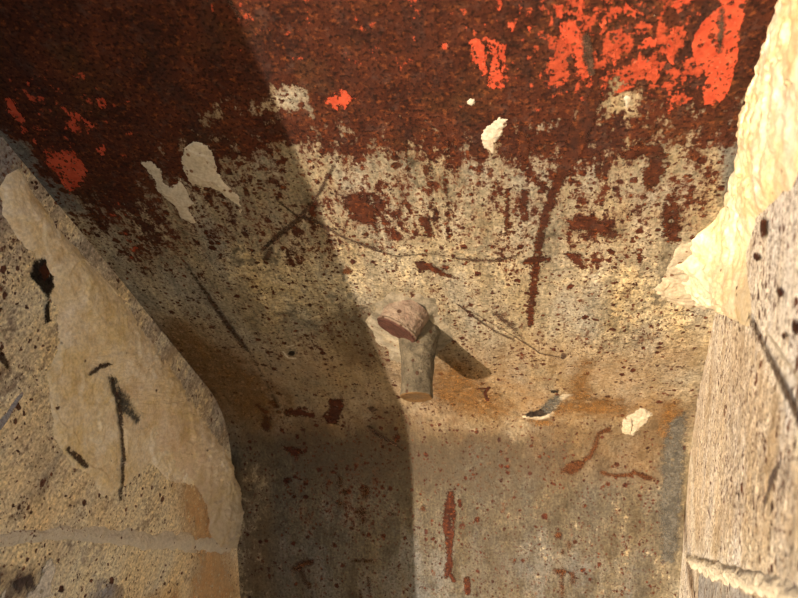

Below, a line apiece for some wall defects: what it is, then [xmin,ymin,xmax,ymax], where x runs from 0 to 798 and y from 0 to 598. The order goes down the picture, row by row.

rust [620,126,670,188]
rust [341,190,379,237]
rust [418,141,451,241]
rust [503,190,511,236]
rust [518,88,603,328]
rust [563,213,623,255]
rust [661,189,682,244]
rust [759,217,767,239]
rust [415,261,459,280]
rust [442,489,471,595]